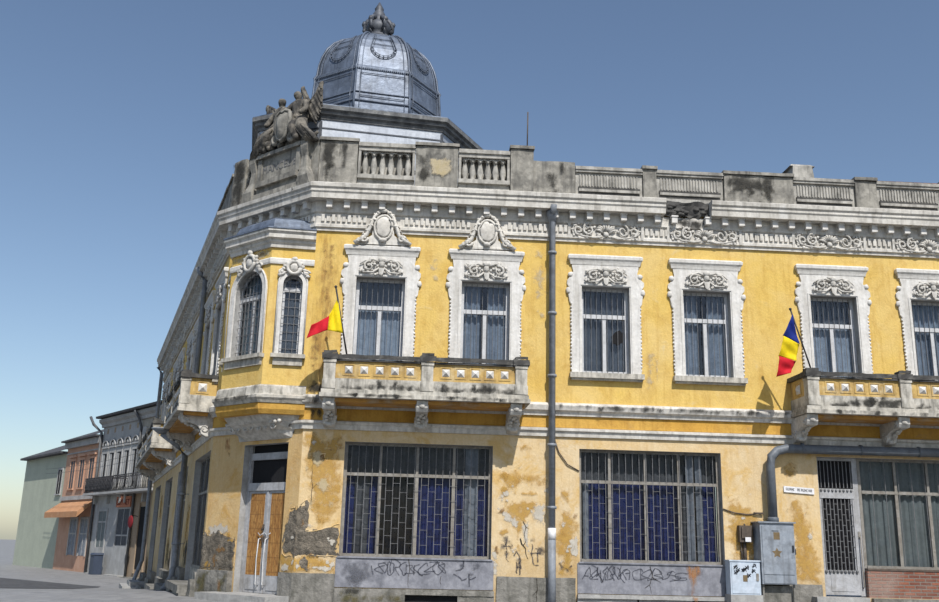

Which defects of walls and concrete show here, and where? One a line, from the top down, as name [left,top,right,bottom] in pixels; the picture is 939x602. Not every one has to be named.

water stain [420,156,451,181]
water stain [728,176,774,202]
water stain [342,381,413,398]
water stain [440,384,517,402]
water stain [832,397,901,415]
flaking render [279,434,342,572]
peeling [498,470,549,559]
flaking render [199,523,236,571]
peeling [557,513,578,574]